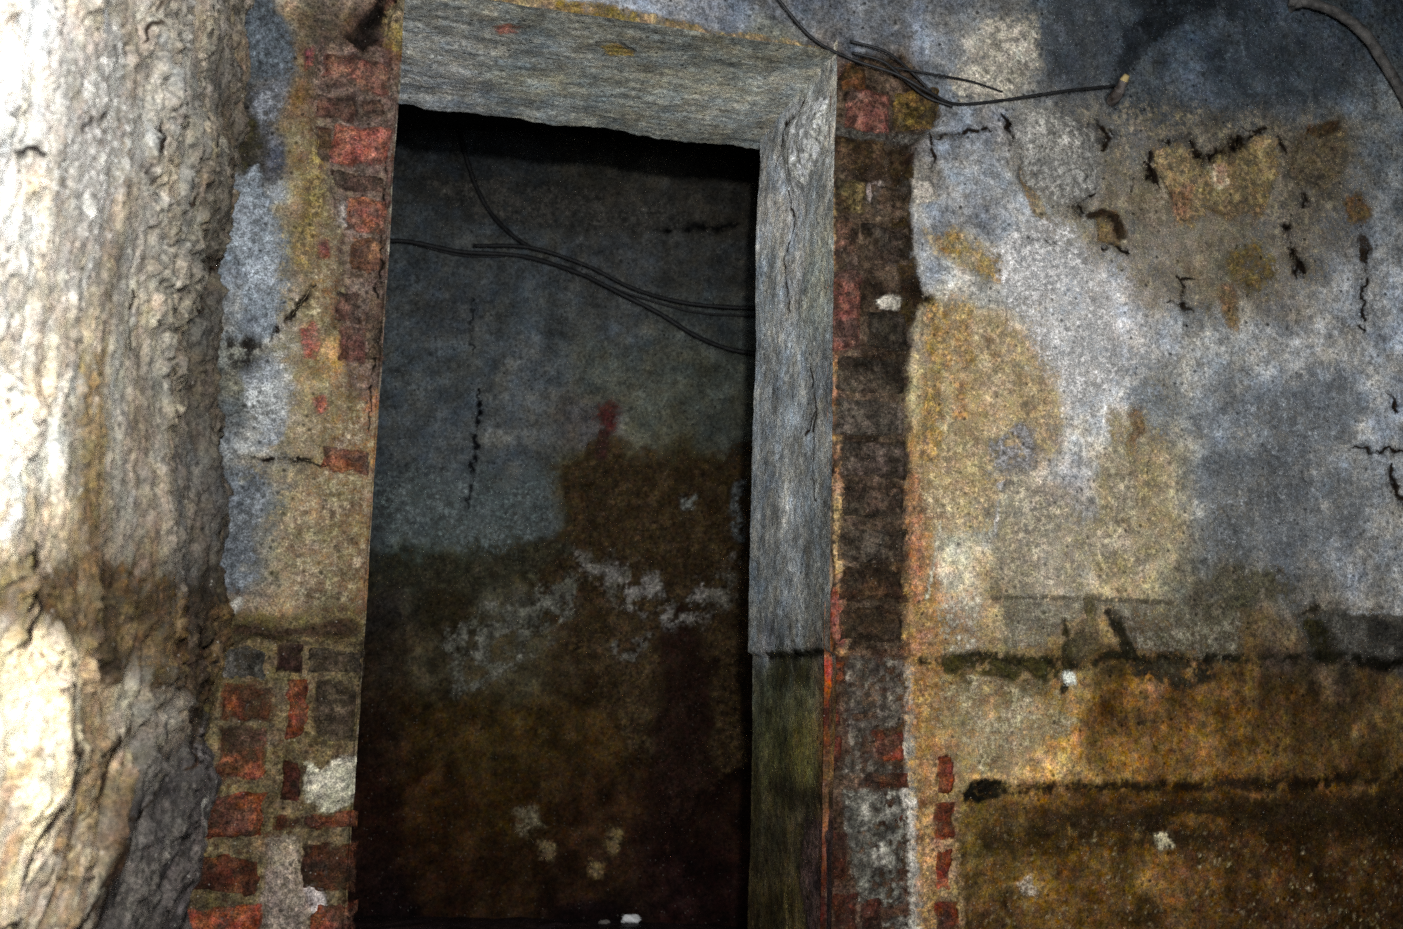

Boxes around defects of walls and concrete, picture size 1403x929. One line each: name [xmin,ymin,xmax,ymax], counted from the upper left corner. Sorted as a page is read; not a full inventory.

flaking render [1153,120,1348,228]
flaking render [269,0,401,617]
flaking render [1217,240,1277,331]
crack [1357,250,1369,332]
crack [465,388,483,509]
flaking render [800,15,1169,929]
crack [1352,445,1403,506]
crack [1384,391,1399,413]
leakage [0,344,752,929]
leakage [767,646,824,686]
leakage [902,349,1403,929]
flaking render [187,635,365,929]